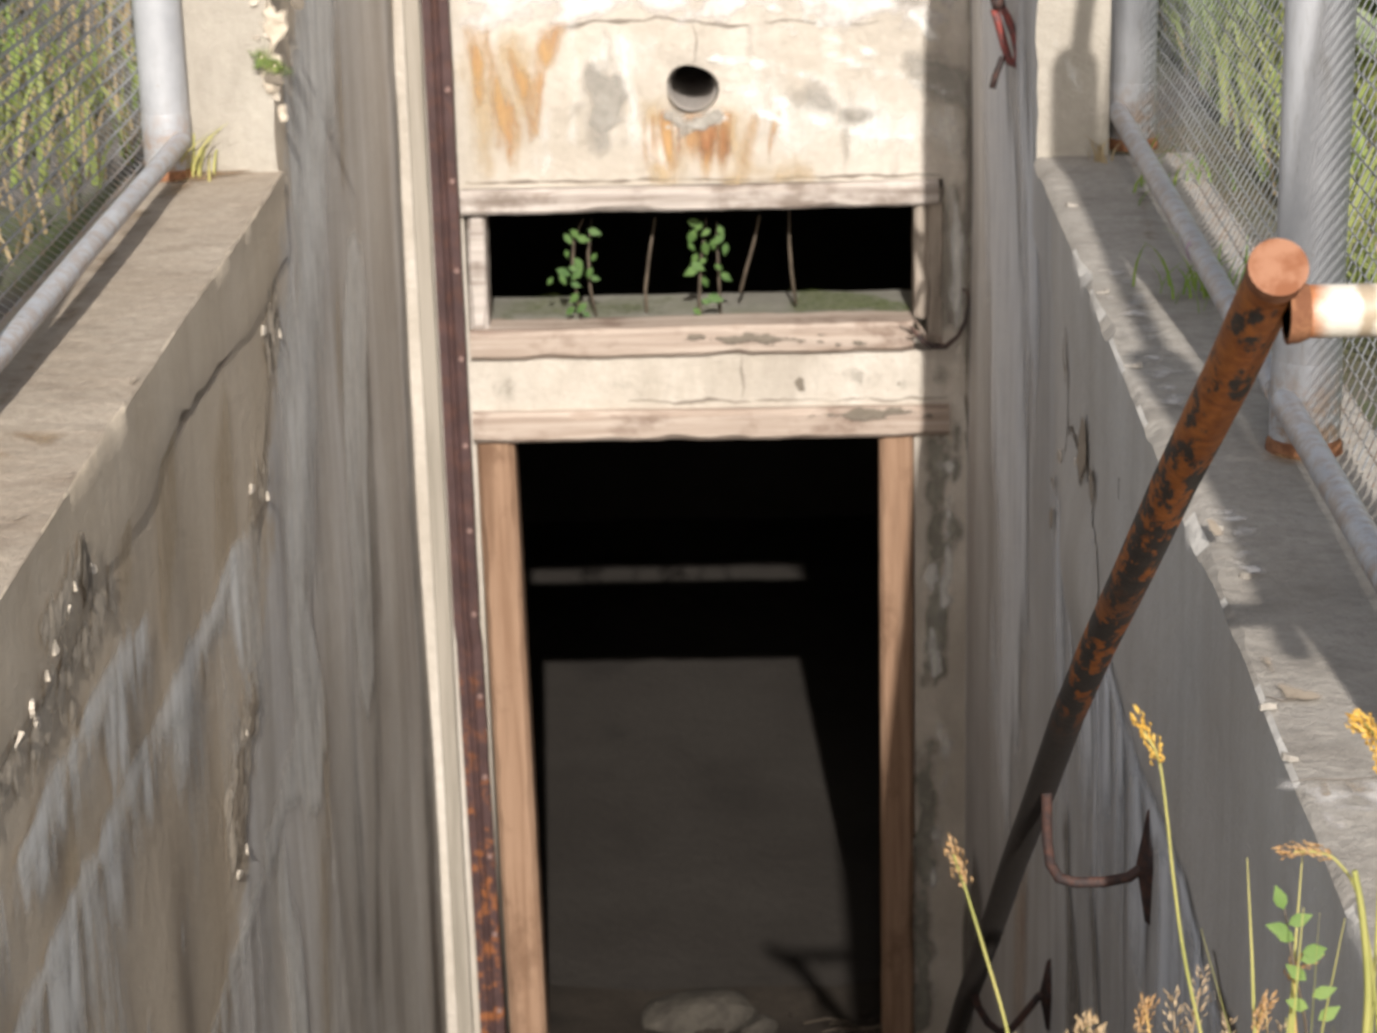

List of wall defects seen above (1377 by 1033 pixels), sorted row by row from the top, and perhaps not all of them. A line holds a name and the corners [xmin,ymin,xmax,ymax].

corrosion [471,29,559,158]
corrosion [646,107,748,184]
crack [1063,327,1119,500]
spalling [0,533,115,806]
leakage [922,427,963,684]
leakage [912,741,947,1032]